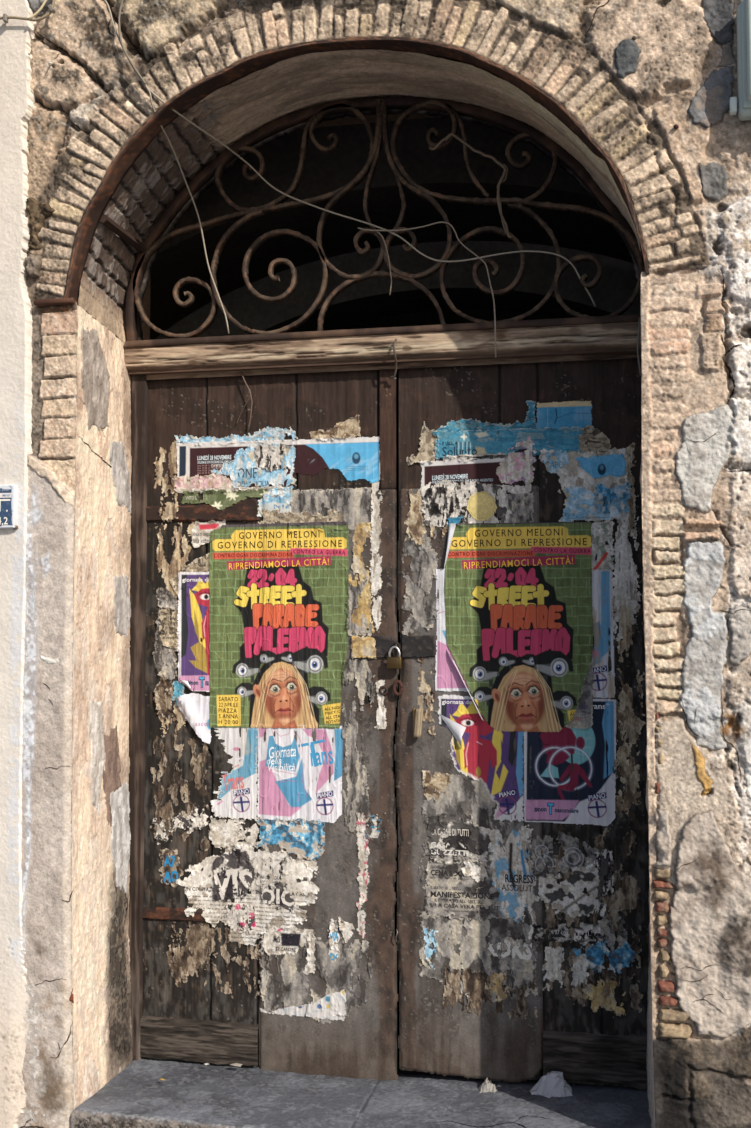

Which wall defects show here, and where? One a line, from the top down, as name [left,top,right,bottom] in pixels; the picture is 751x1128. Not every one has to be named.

peeling [27,455,75,510]
flaking render [655,713,665,764]
spalling [691,743,713,796]
peeling [742,738,751,799]
peeling [652,809,751,1039]
crack [20,1119,44,1128]